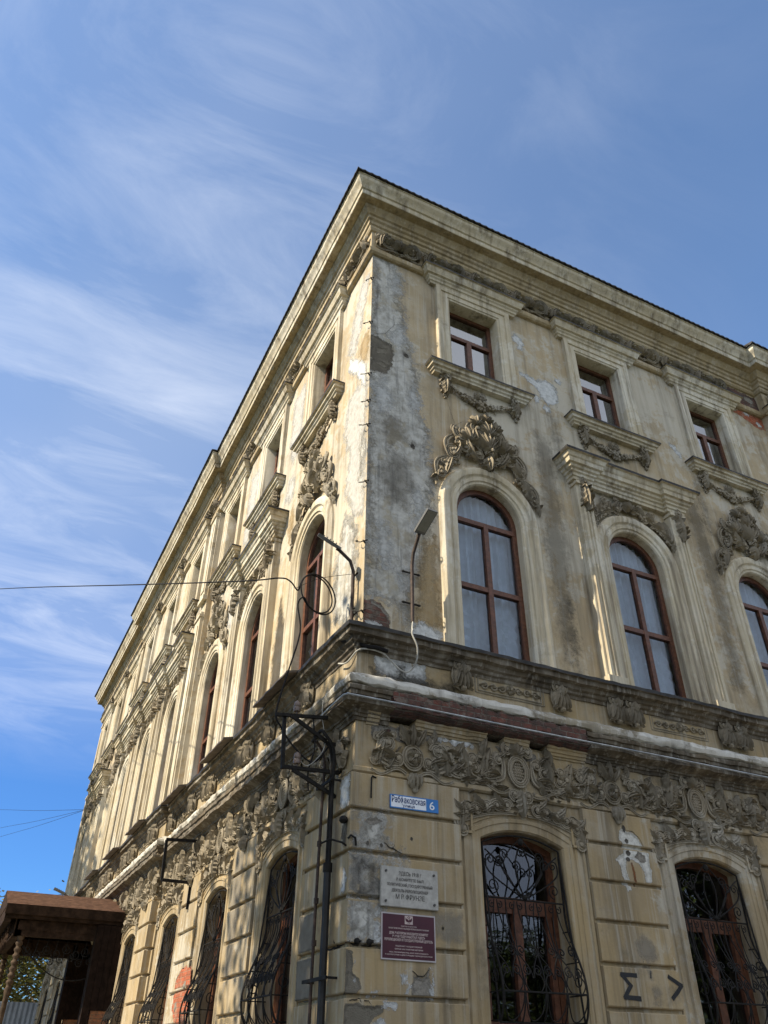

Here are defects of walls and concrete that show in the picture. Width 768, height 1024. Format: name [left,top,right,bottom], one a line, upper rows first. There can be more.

peeling [519,371,562,416]
spalling [727,387,766,431]
peeling [332,257,444,640]
spalling [371,655,590,762]
peeling [340,772,410,948]
spalling [615,826,652,892]
spalling [171,966,192,1024]
spalling [366,967,435,1024]